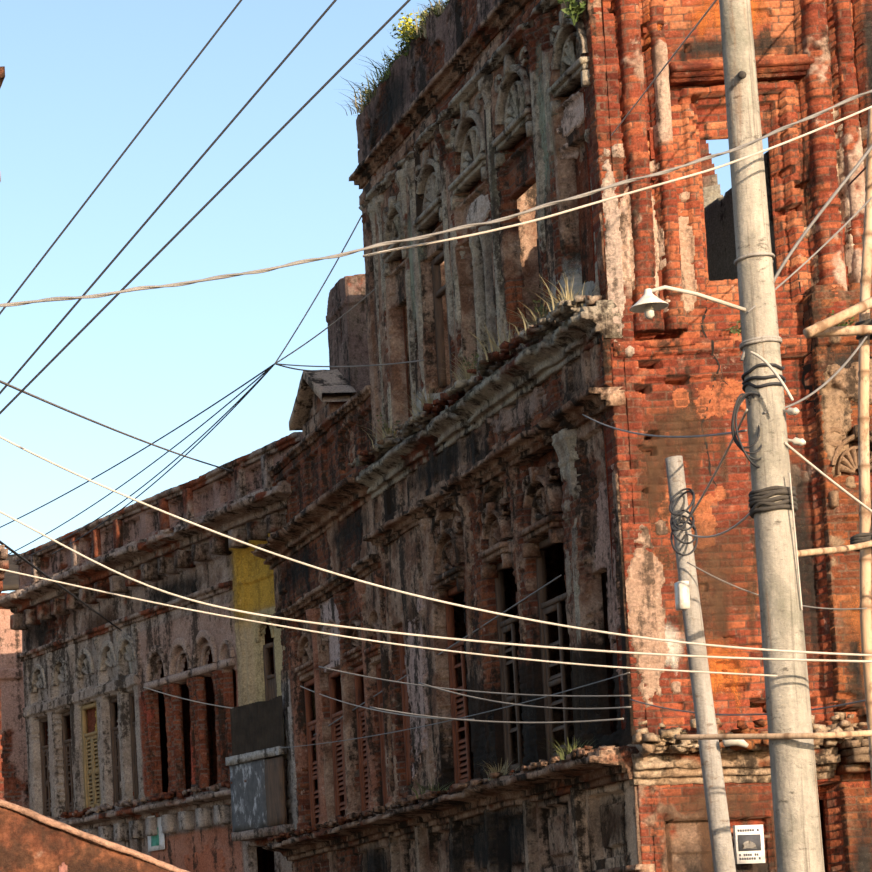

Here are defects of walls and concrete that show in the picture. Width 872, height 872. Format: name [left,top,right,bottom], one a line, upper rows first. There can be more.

flaking render [601,144,635,358]
flaking render [819,365,856,488]
spalling [687,486,726,550]
flaking render [594,481,681,708]
damp [58,860,148,872]
damp [449,809,526,872]
damp [589,807,627,871]